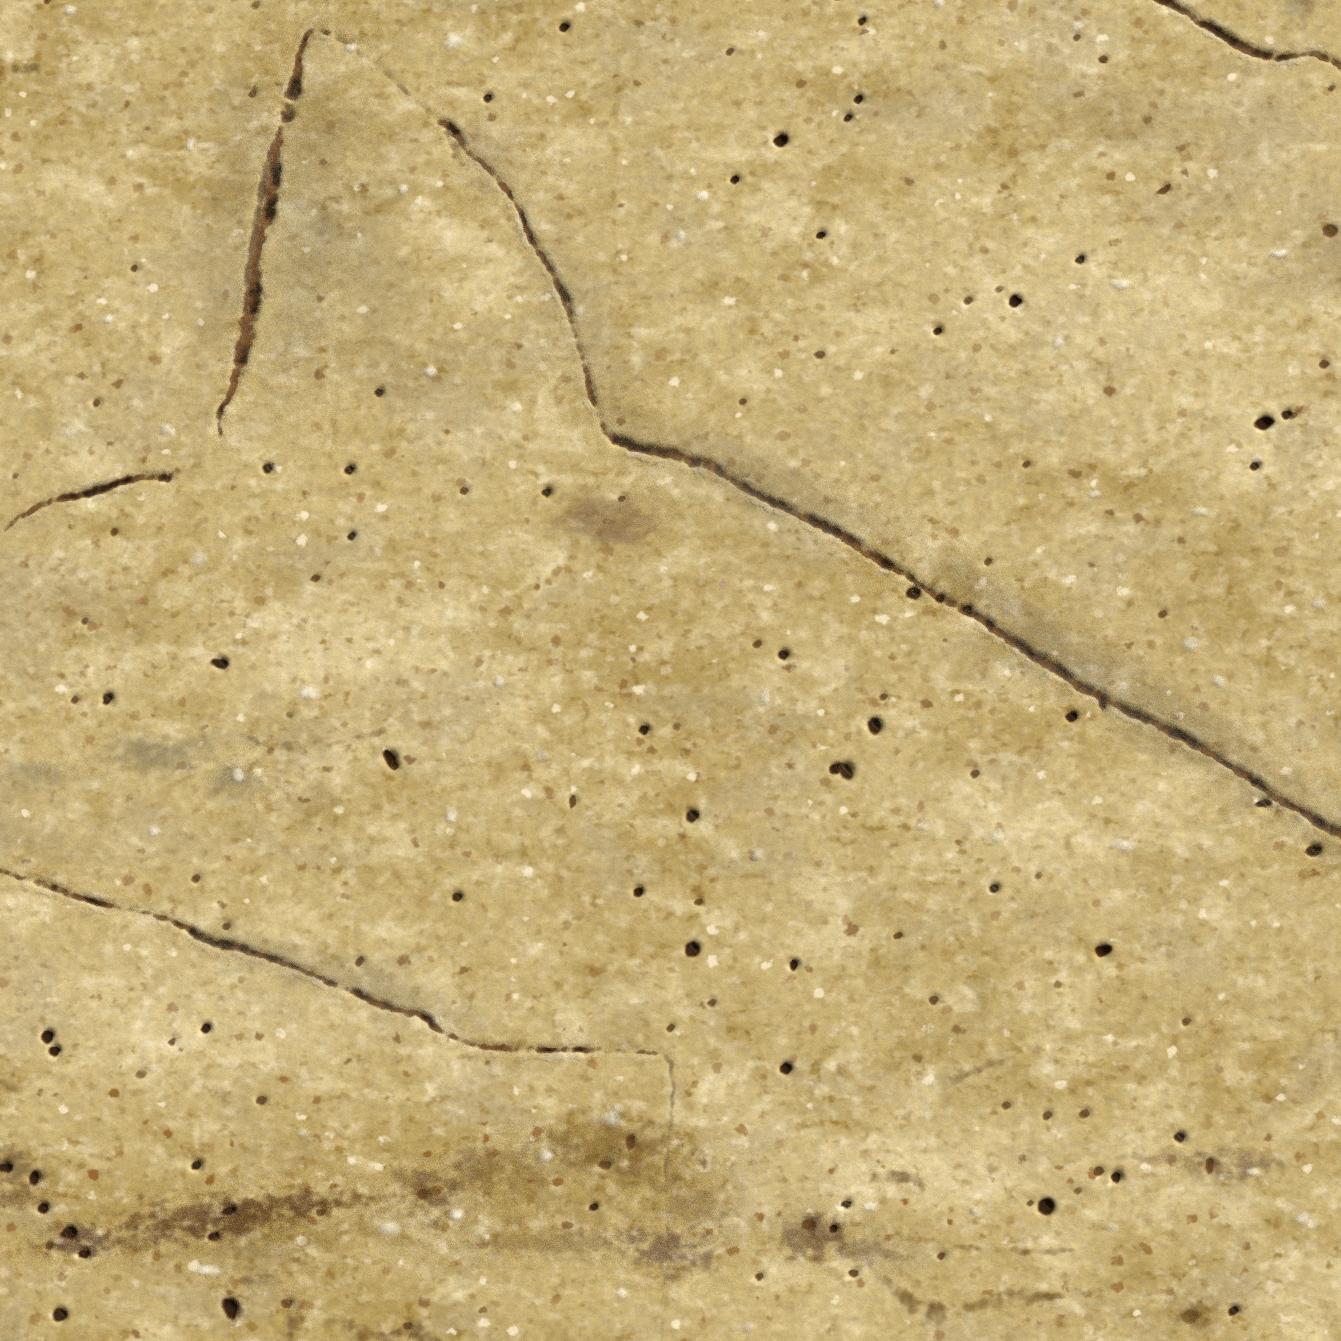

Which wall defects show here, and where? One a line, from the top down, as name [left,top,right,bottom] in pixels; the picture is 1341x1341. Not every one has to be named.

crack [1155,0,1341,69]
crack [217,29,359,434]
crack [6,473,173,530]
crack [439,120,1341,837]
crack [0,868,676,1105]